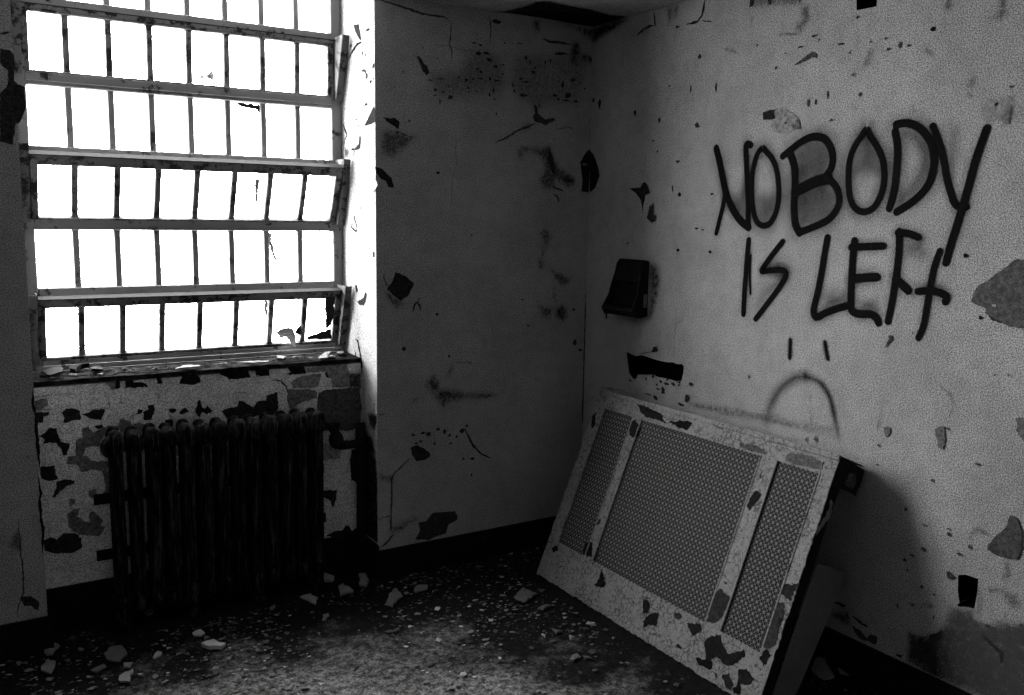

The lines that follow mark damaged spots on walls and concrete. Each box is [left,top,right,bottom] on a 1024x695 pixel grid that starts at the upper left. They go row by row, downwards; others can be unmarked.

peeling [0,49,26,145]
crack [496,105,571,143]
peeling [763,107,801,134]
spalling [580,150,600,192]
peeling [630,182,656,223]
peeling [383,272,414,306]
peeling [971,259,1024,329]
peeling [165,351,350,426]
spalling [627,347,693,438]
peeling [35,398,155,554]
peeling [973,516,1022,559]
spalling [947,571,978,608]